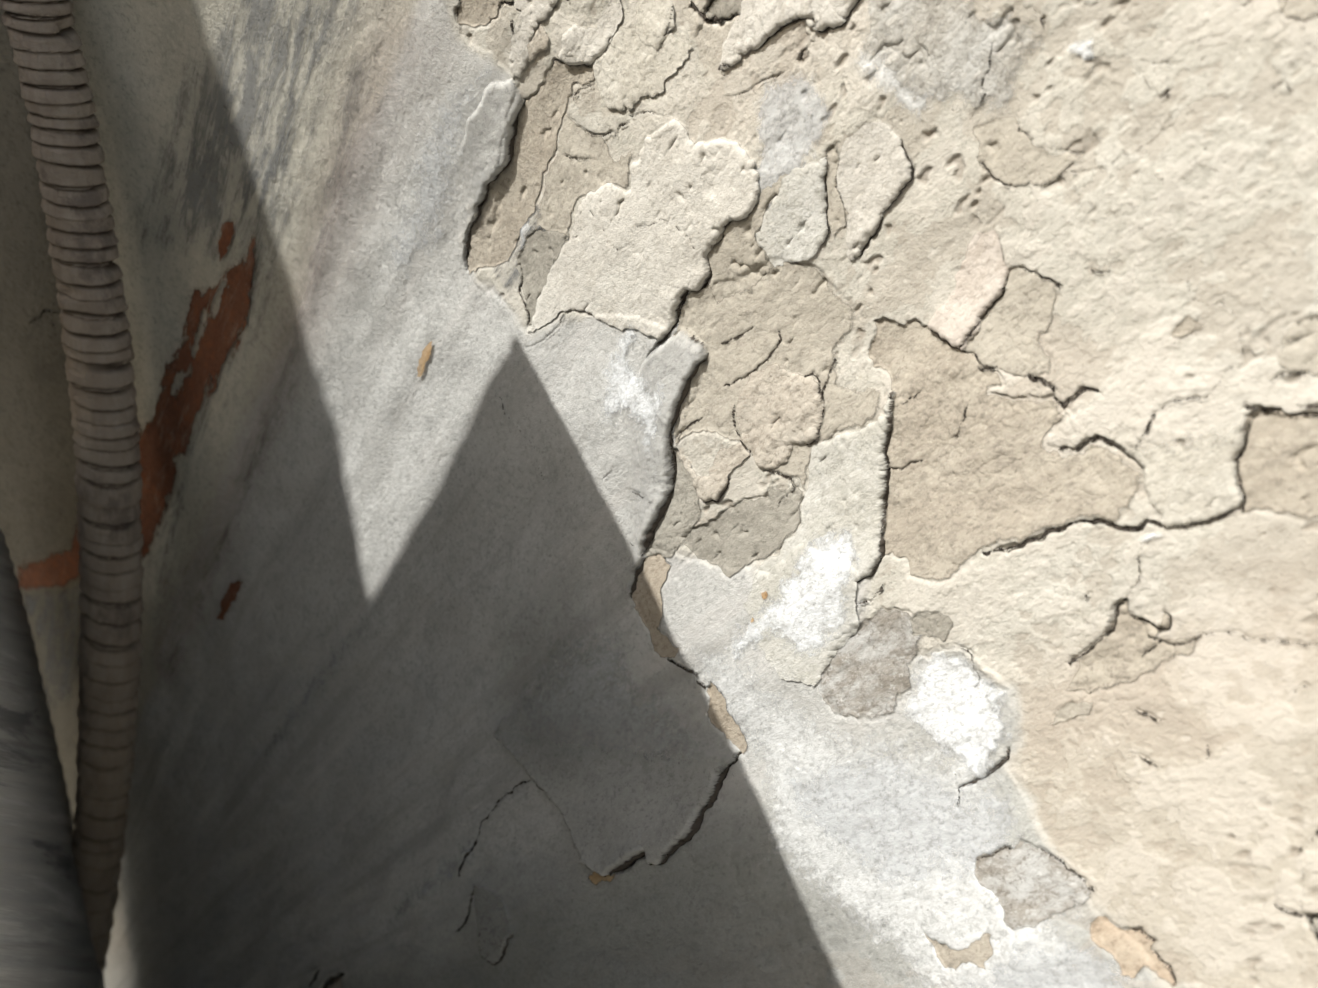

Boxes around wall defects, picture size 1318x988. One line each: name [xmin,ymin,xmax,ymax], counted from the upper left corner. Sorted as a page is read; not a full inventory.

water stain [161,0,338,245]
corrosion [18,527,81,591]
corrosion [138,221,257,561]
corrosion [217,581,243,620]
crack [590,205,795,595]
spalling [455,0,1318,718]
crack [856,391,922,605]
crack [983,317,1318,665]
crack [1059,278,1245,465]
peeling [495,735,720,876]
spalling [925,933,993,970]
spalling [975,840,1091,930]